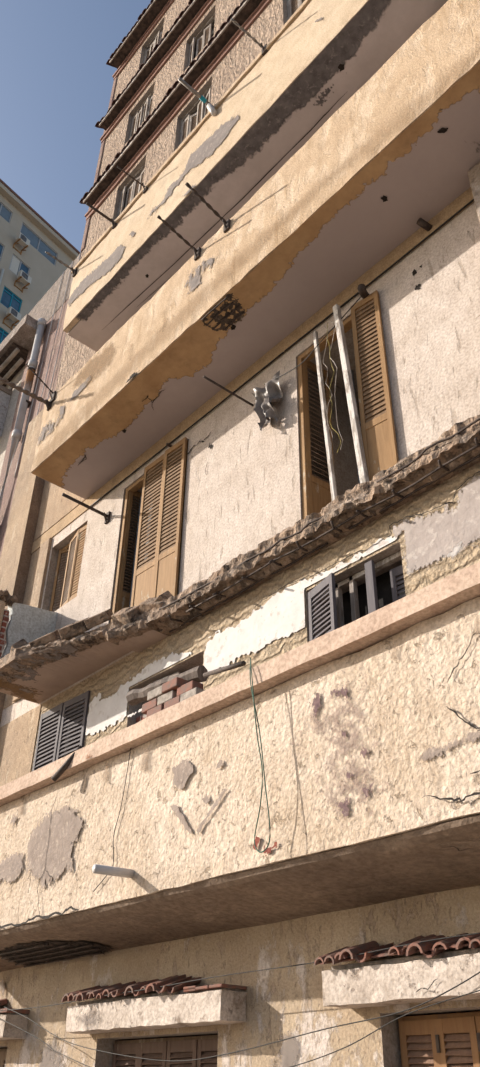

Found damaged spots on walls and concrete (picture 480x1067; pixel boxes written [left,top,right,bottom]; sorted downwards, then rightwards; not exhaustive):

peeling [147,115,239,219]
peeling [67,231,135,307]
peeling [183,256,218,294]
spalling [201,293,246,331]
peeling [204,476,480,672]
peeling [85,652,191,735]
peeling [309,684,348,716]
crack [446,633,480,731]
peeling [336,795,350,820]
crack [422,770,480,802]
peeling [0,805,85,889]
spalling [0,941,114,968]